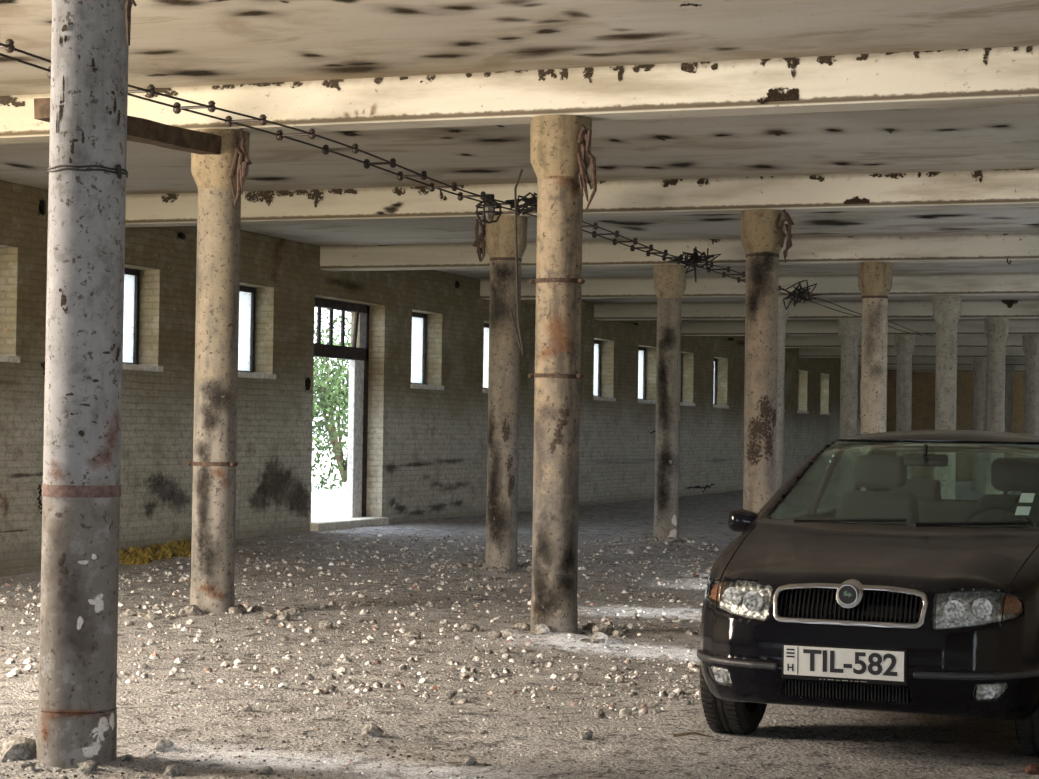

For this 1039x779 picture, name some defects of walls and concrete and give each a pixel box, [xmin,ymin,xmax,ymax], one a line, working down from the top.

water stain [426,42,474,58]
water stain [609,30,664,54]
peeling [322,79,344,91]
water stain [304,54,377,73]
peeling [466,68,568,81]
peeling [610,64,655,82]
peeling [680,62,718,73]
spalling [757,57,800,104]
water stain [203,385,229,430]
water stain [197,443,216,583]
water stain [534,537,575,617]
flaking render [82,713,114,758]